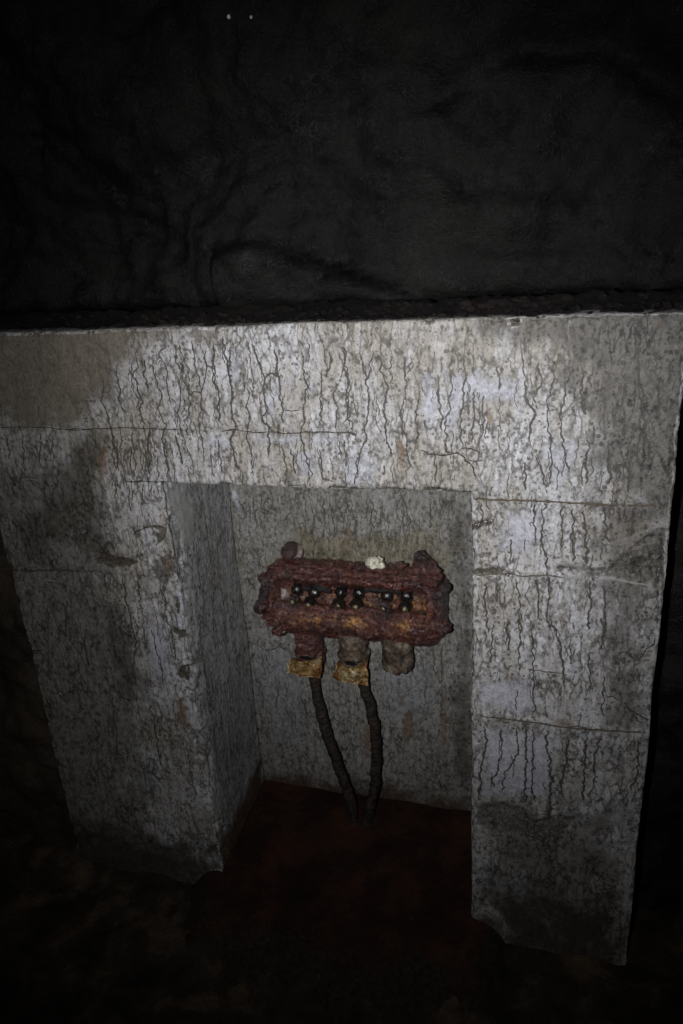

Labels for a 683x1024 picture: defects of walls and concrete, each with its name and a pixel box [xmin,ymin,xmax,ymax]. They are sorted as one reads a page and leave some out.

crack [2,424,178,432]
crack [225,410,361,435]
crack [421,441,654,510]
crack [126,480,165,501]
crack [477,565,568,578]
damp [0,315,683,917]
crack [529,669,565,690]
crack [483,696,648,733]